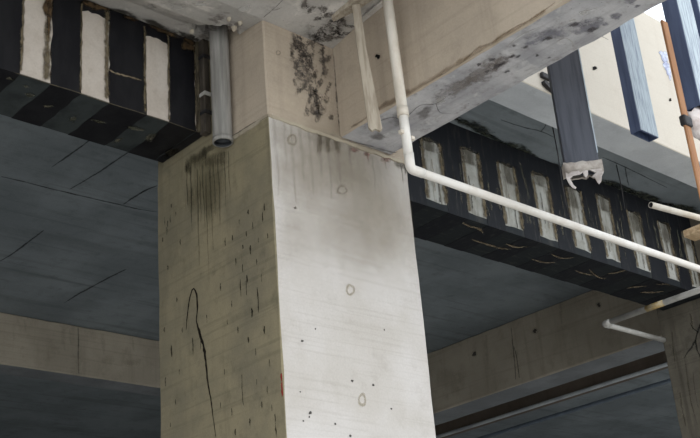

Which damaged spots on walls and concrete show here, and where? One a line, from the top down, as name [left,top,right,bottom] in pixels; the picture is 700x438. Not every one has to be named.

water stain [290,1,354,121]
crack [186,288,216,437]
crack [684,323,700,358]